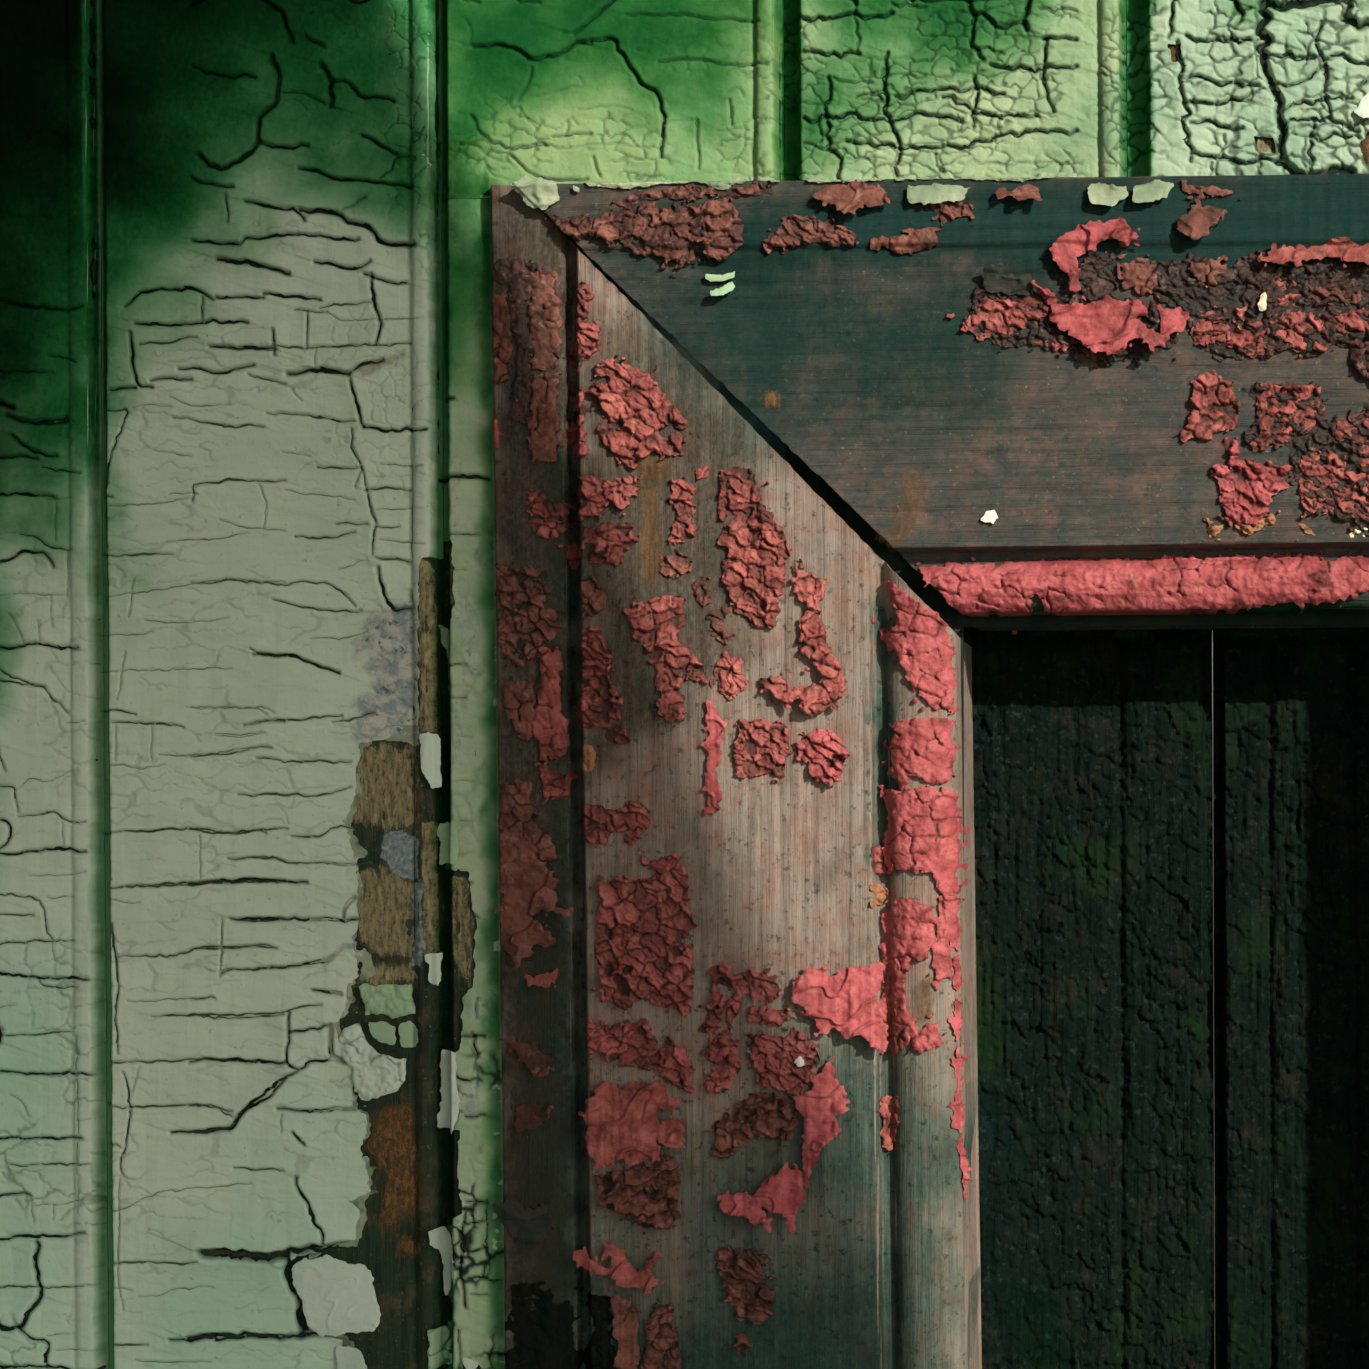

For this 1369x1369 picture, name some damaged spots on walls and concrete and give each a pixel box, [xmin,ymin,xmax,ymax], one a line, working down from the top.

crack [684,14,755,23]
crack [804,0,1077,175]
crack [1168,0,1369,175]
peeling [1354,92,1369,119]
crack [0,103,478,1369]
peeling [338,544,474,1101]
peeling [491,172,1369,1369]
peeling [437,1049,460,1134]
crack [456,998,483,1081]
peeling [292,1254,381,1369]
peeling [428,1226,454,1295]
peeling [427,1325,479,1369]